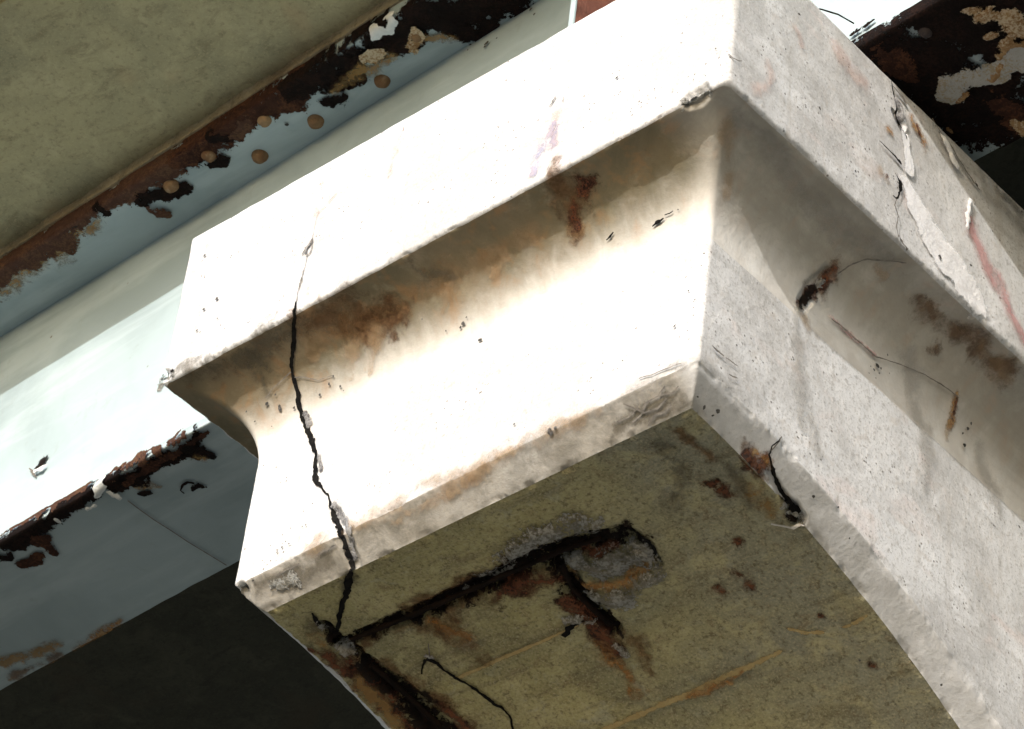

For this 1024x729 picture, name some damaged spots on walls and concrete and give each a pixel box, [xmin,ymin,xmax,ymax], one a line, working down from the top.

peeling [960,6,982,16]
peeling [987,47,1024,76]
rust [0,0,535,296]
rust [530,121,598,241]
spalling [879,79,989,318]
crack [266,195,358,633]
rust [0,423,217,569]
crack [421,643,514,729]
spalling [311,512,667,729]